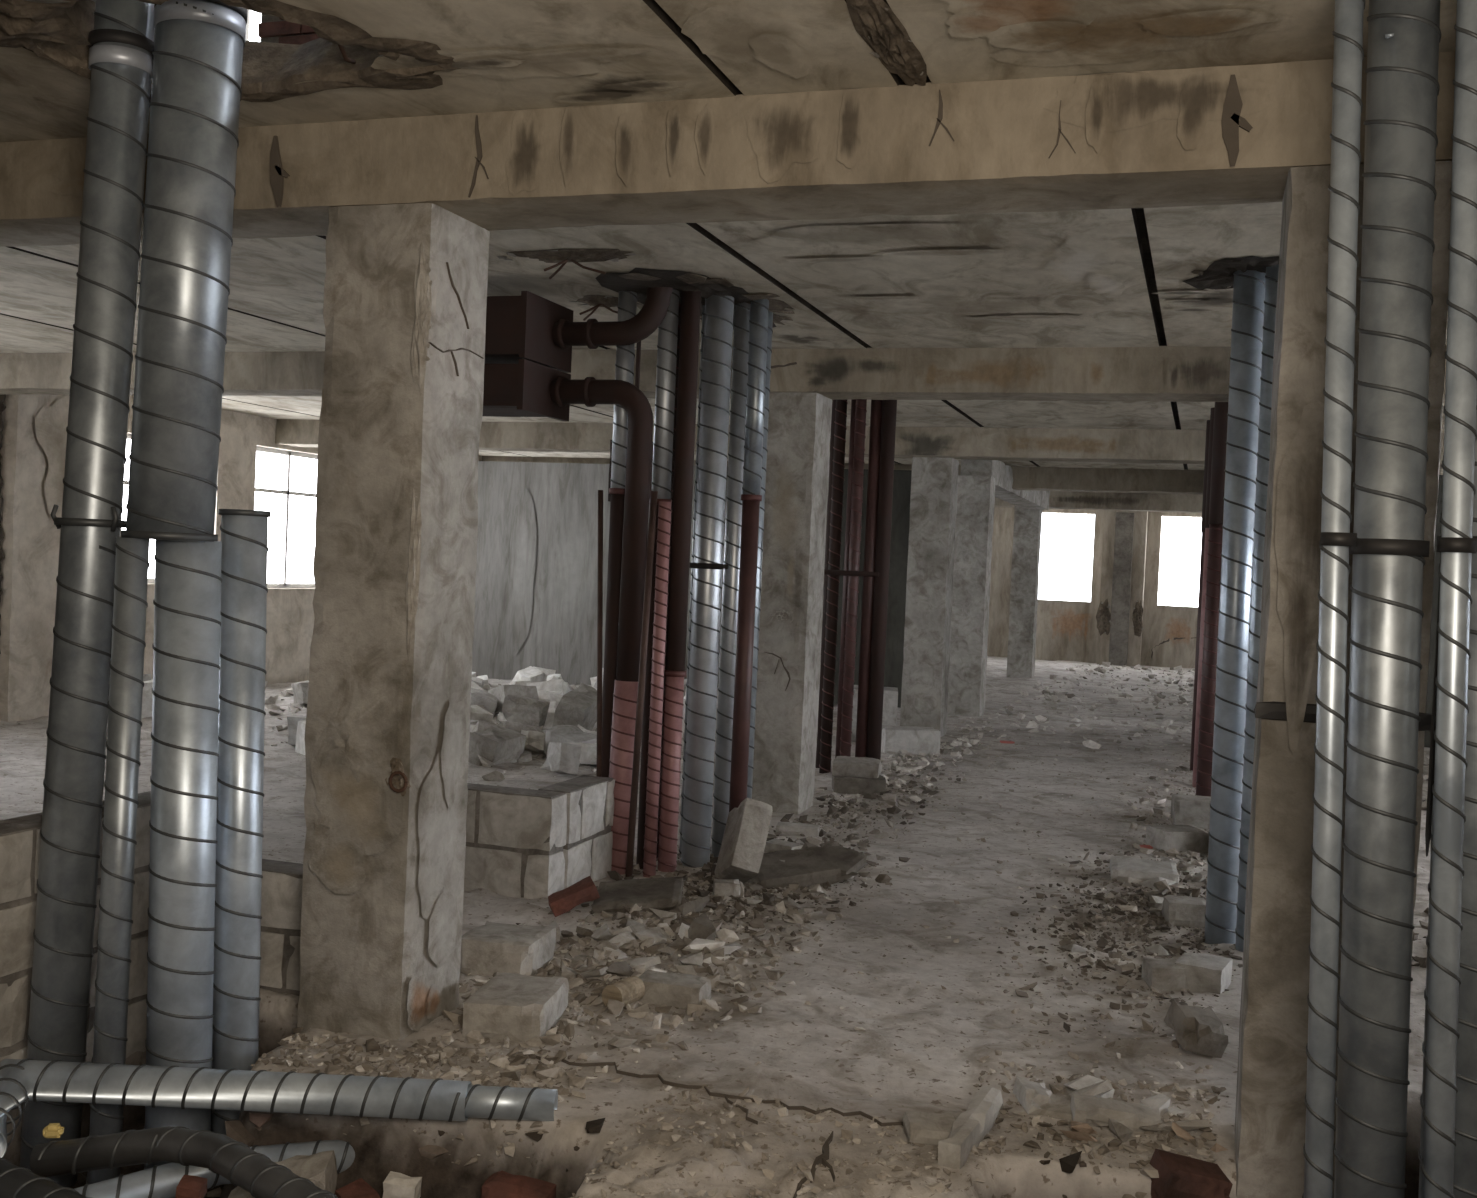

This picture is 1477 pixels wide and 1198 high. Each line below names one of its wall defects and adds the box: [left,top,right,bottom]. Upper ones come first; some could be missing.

spalling [0,0,91,80]
spalling [219,0,461,102]
leakage [451,58,525,69]
leakage [681,5,823,78]
leakage [506,70,715,195]
leakage [745,89,865,183]
crack [516,1054,904,1198]